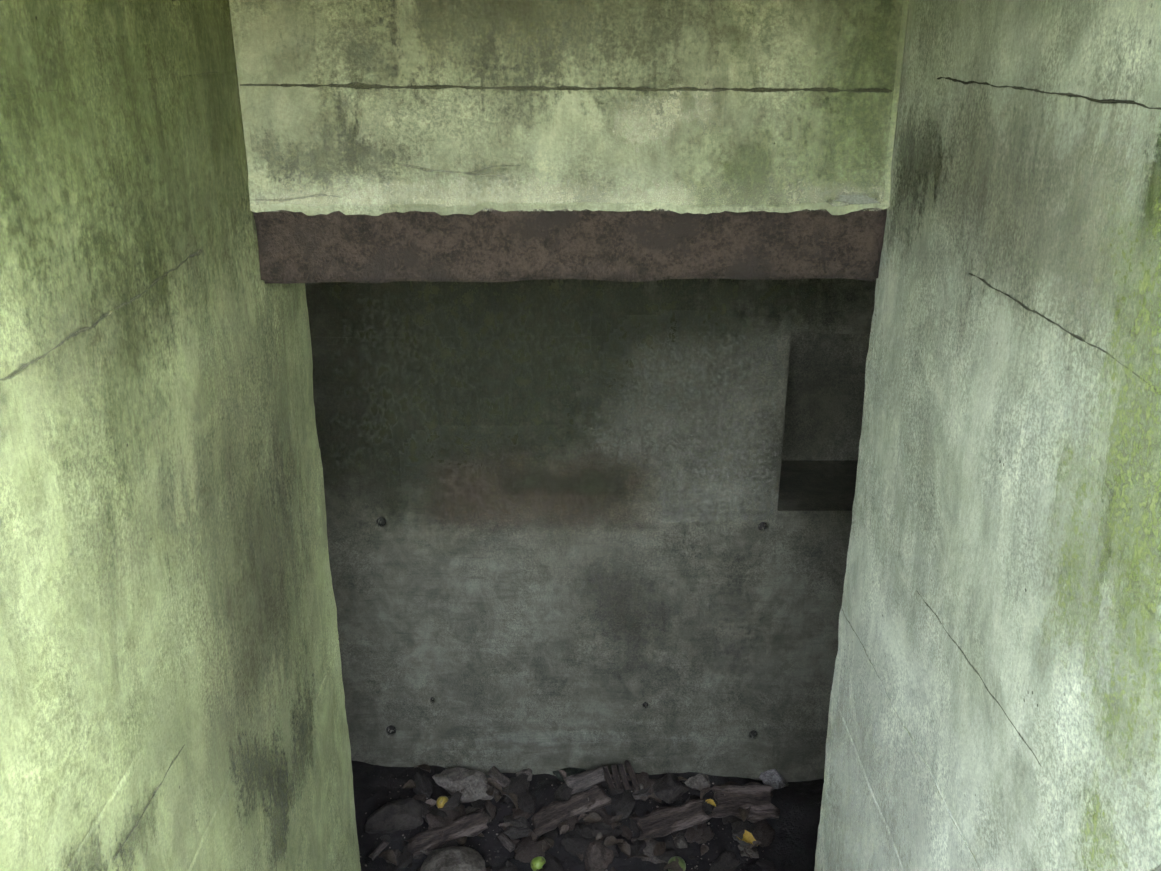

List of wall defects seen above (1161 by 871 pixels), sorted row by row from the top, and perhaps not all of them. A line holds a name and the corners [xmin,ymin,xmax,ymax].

crack [240,82,892,93]
crack [937,77,1161,110]
crack [395,163,514,177]
crack [259,193,338,201]
crack [1,250,202,380]
crack [969,273,1147,383]
leakage [231,674,314,869]